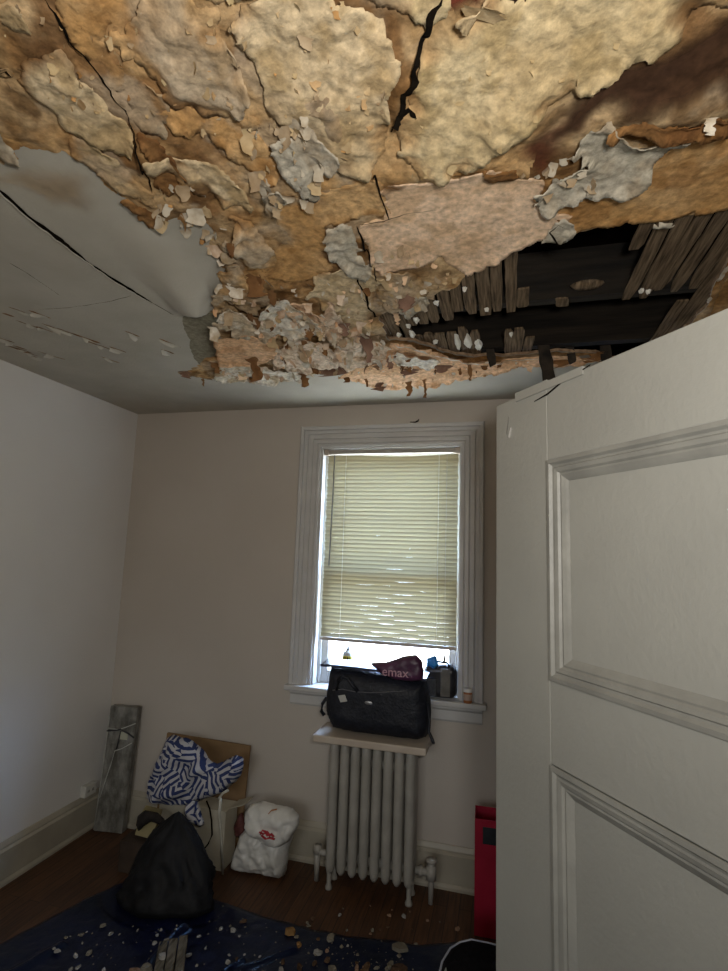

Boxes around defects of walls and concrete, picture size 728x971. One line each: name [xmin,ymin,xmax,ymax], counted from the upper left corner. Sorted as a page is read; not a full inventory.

crack [46,1,152,192]
crack [391,0,443,132]
leakage [528,18,728,167]
crack [0,190,173,315]
peeling [0,0,728,398]